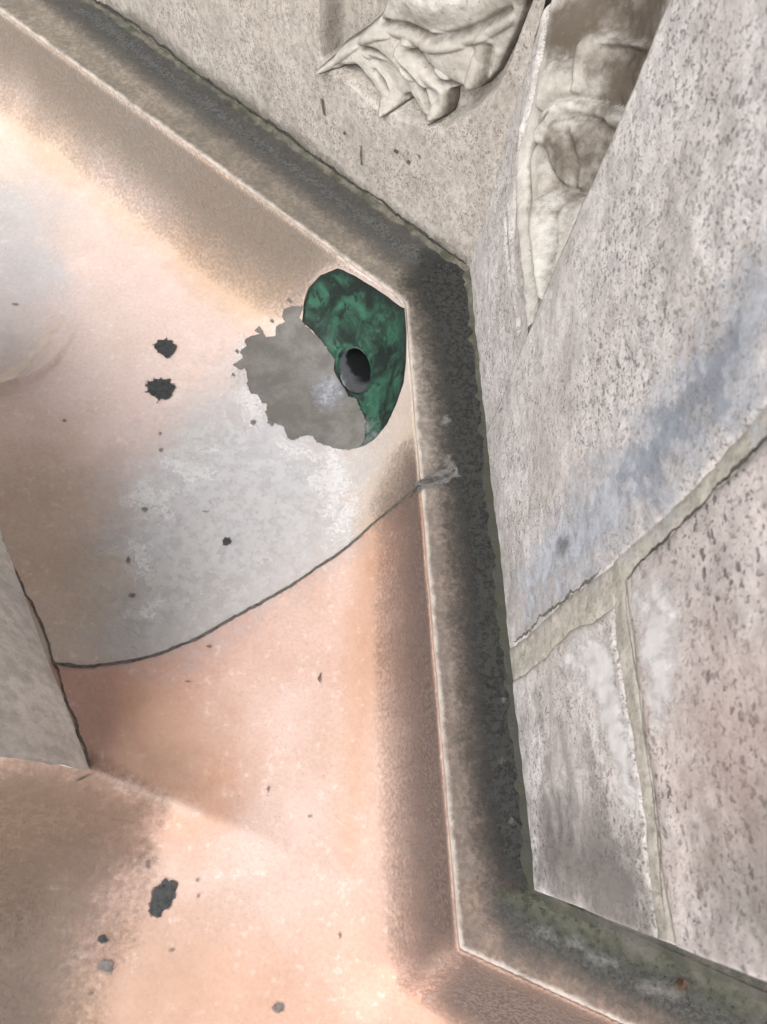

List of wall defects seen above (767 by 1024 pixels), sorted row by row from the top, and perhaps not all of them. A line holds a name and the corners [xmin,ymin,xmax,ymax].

crack [2,467,460,782]
spalling [231,298,366,450]
water stain [0,0,636,922]
water stain [381,448,608,1024]